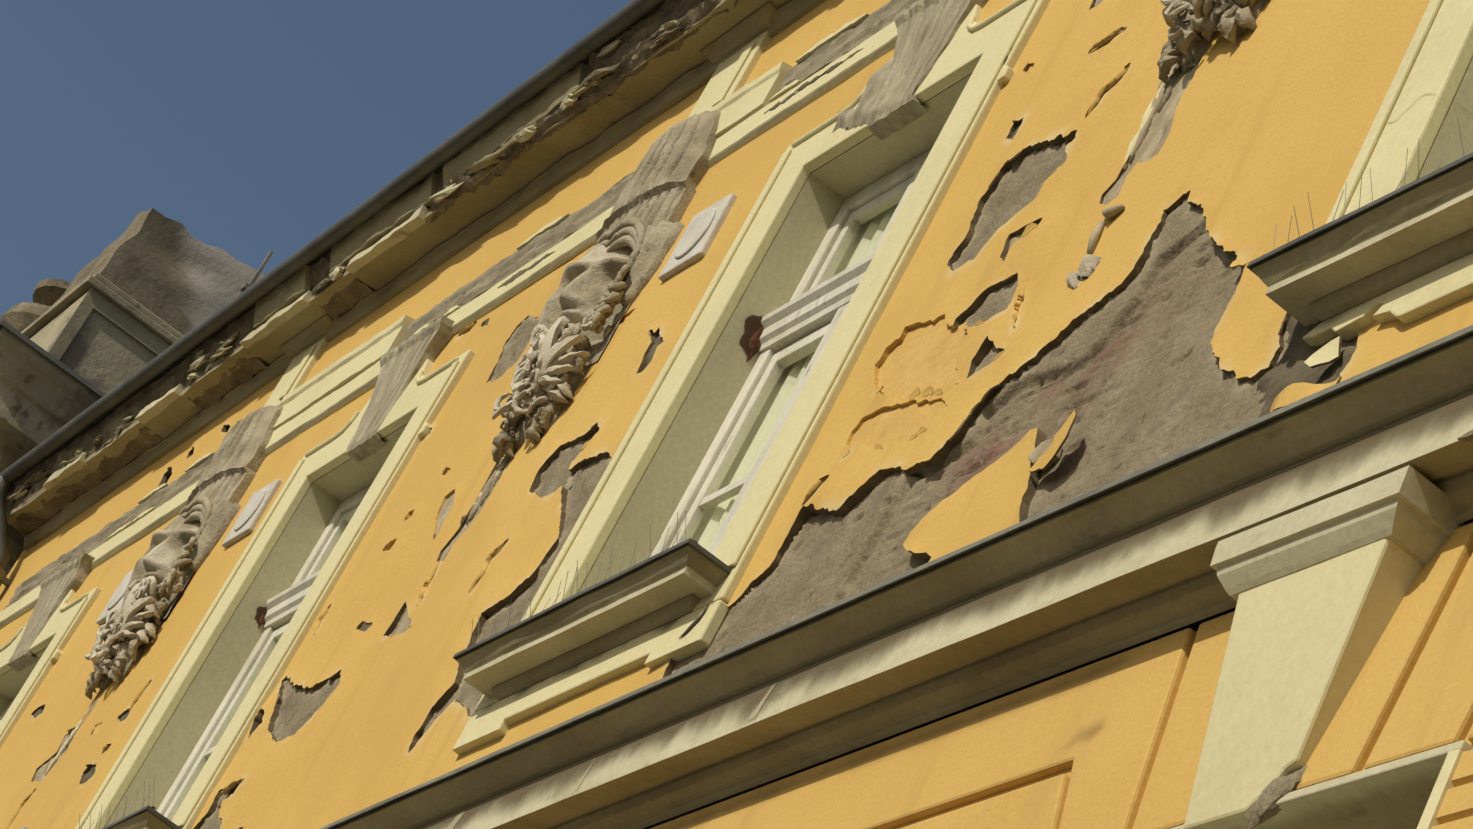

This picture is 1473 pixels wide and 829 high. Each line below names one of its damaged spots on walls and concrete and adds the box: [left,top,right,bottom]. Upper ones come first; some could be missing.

spalling [428,0,739,224]
spalling [764,0,924,114]
spalling [401,171,635,342]
flaking render [952,119,1072,332]
spalling [5,395,162,537]
spalling [3,452,216,610]
spalling [187,319,267,409]
flaking render [488,315,539,382]
flaking render [476,423,612,643]
flaking render [672,198,1358,674]
flaking render [253,675,340,741]
spalling [1245,765,1309,829]